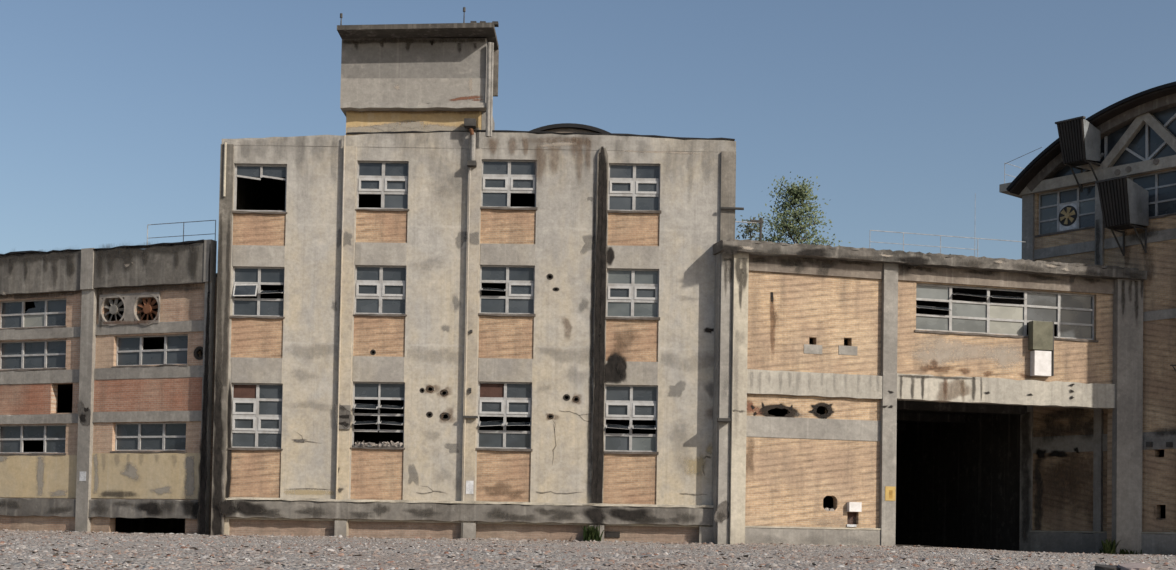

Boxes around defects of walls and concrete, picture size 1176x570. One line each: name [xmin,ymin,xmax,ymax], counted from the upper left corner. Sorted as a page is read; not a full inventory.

water stain [0,250,79,299]
water stain [721,245,932,306]
water stain [1019,224,1100,283]
water stain [1122,273,1143,317]
water stain [489,146,691,536]
water stain [94,220,280,535]
spalling [747,402,834,419]